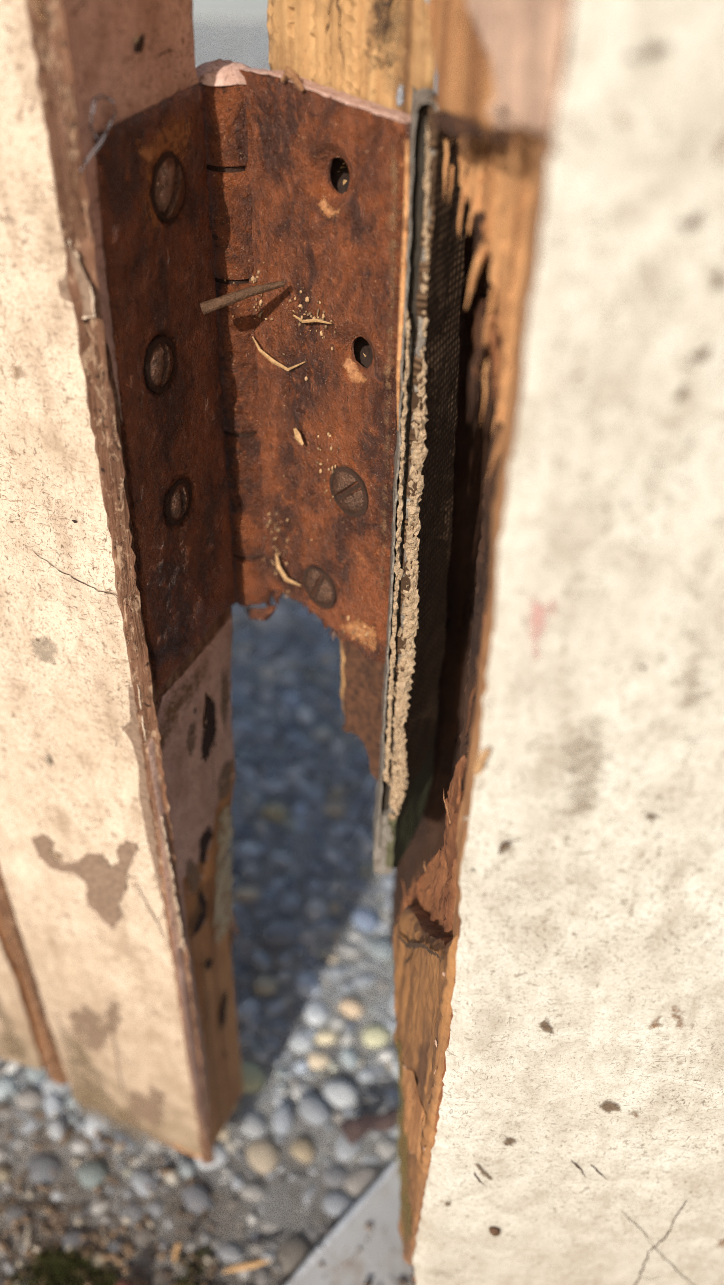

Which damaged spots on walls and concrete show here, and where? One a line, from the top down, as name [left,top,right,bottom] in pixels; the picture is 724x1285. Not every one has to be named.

rust [136,117,195,231]
rust [317,196,340,218]
rust [344,358,367,384]
rust [245,605,276,621]
rust [340,619,378,651]
spalling [0,590,429,1285]
crack [620,1201,693,1285]